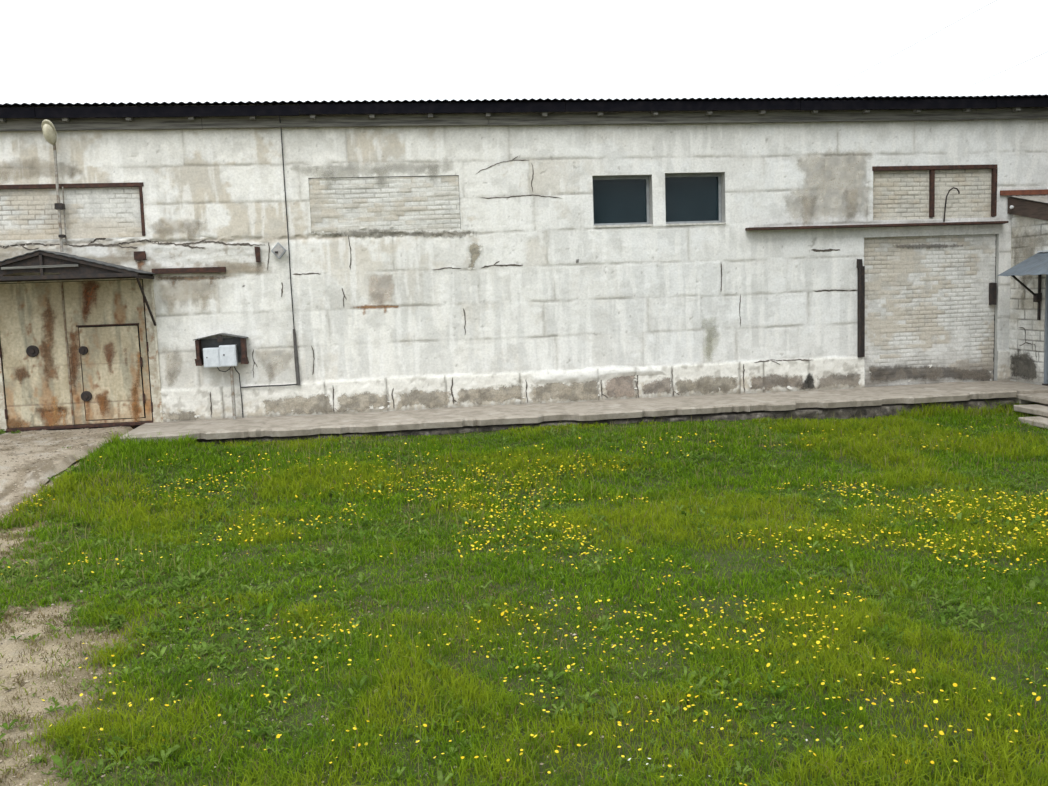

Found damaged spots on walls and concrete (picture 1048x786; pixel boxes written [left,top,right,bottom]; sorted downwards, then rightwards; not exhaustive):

crack [475,156,562,199]
crack [0,238,319,297]
corrosion [82,280,99,315]
corrosion [15,367,29,381]
corrosion [42,300,57,386]
corrosion [70,331,82,392]
corrosion [105,343,114,372]
corrosion [86,352,140,422]
damp [801,374,814,389]
corrosion [36,397,66,426]